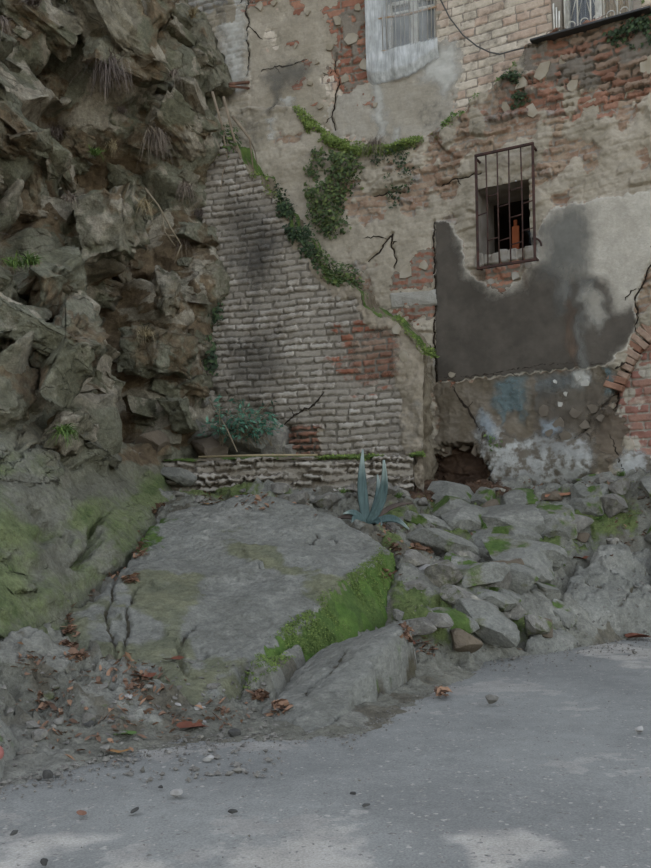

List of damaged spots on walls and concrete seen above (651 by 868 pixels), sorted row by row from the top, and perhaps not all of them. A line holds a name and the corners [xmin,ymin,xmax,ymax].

crack [240,0,307,76]
crack [324,60,340,131]
spalling [289,0,378,108]
spalling [494,14,651,118]
crack [365,234,397,266]
spalling [389,247,436,292]
spalling [351,303,437,380]
crack [432,222,651,428]
crack [575,429,624,469]